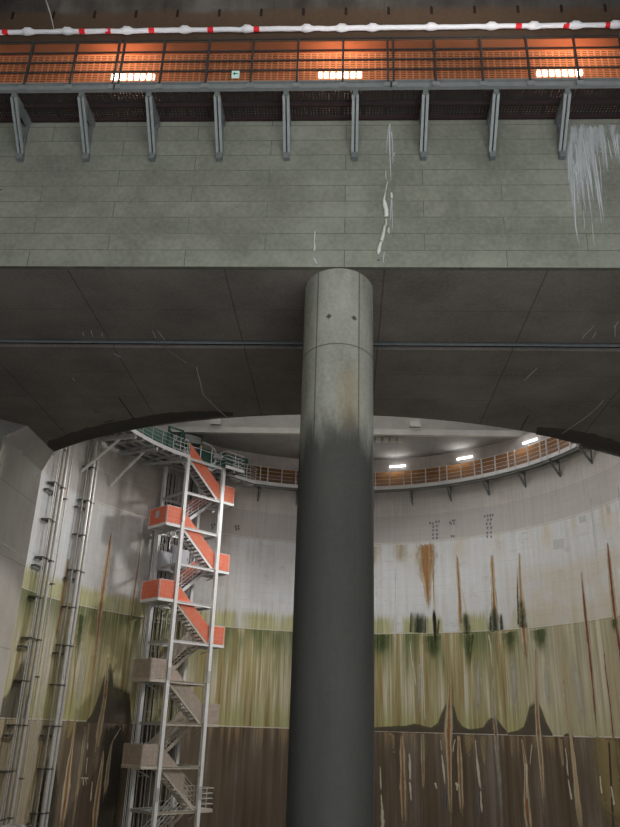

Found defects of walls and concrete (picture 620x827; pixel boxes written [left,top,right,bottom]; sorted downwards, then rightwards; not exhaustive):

efflorescence [568,124,620,248]
corrosion [60,710,87,826]
corrosion [92,658,113,827]
corrosion [94,533,112,655]
corrosion [417,543,435,603]
leakage [374,643,553,820]
corrosion [490,555,498,619]
corrosion [510,736,532,827]
corrosion [518,554,544,797]
corrosion [581,574,595,711]
leakage [600,742,615,827]
corrosion [607,542,620,666]